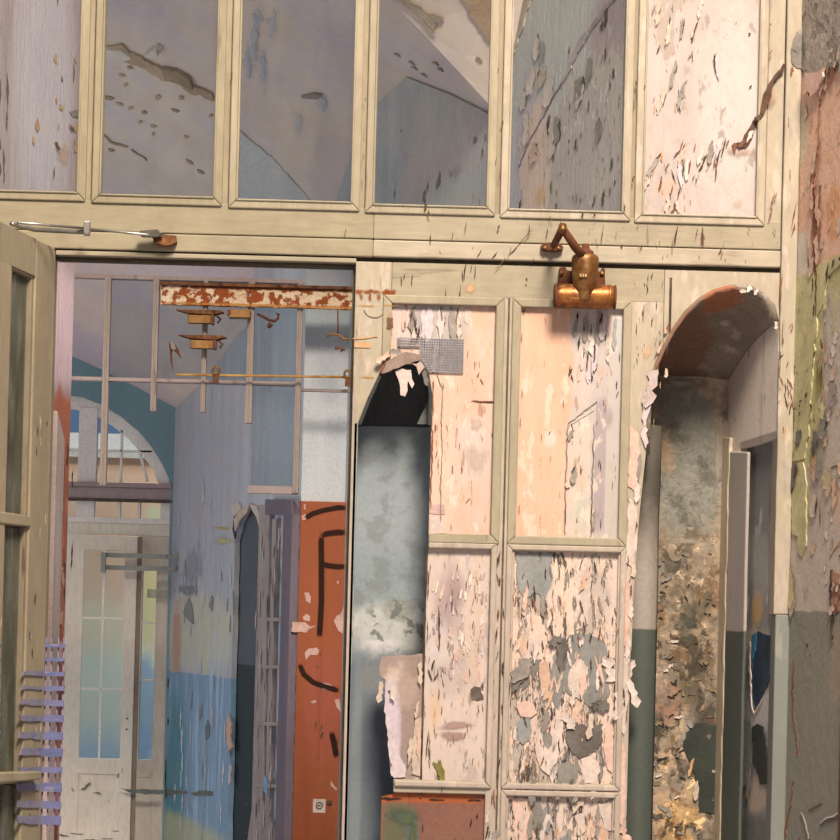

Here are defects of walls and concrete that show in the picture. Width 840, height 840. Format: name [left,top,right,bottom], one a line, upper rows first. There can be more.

peeling [429,504,446,534]
peeling [470,282,669,840]
peeling [376,681,396,703]
peeling [385,701,445,780]